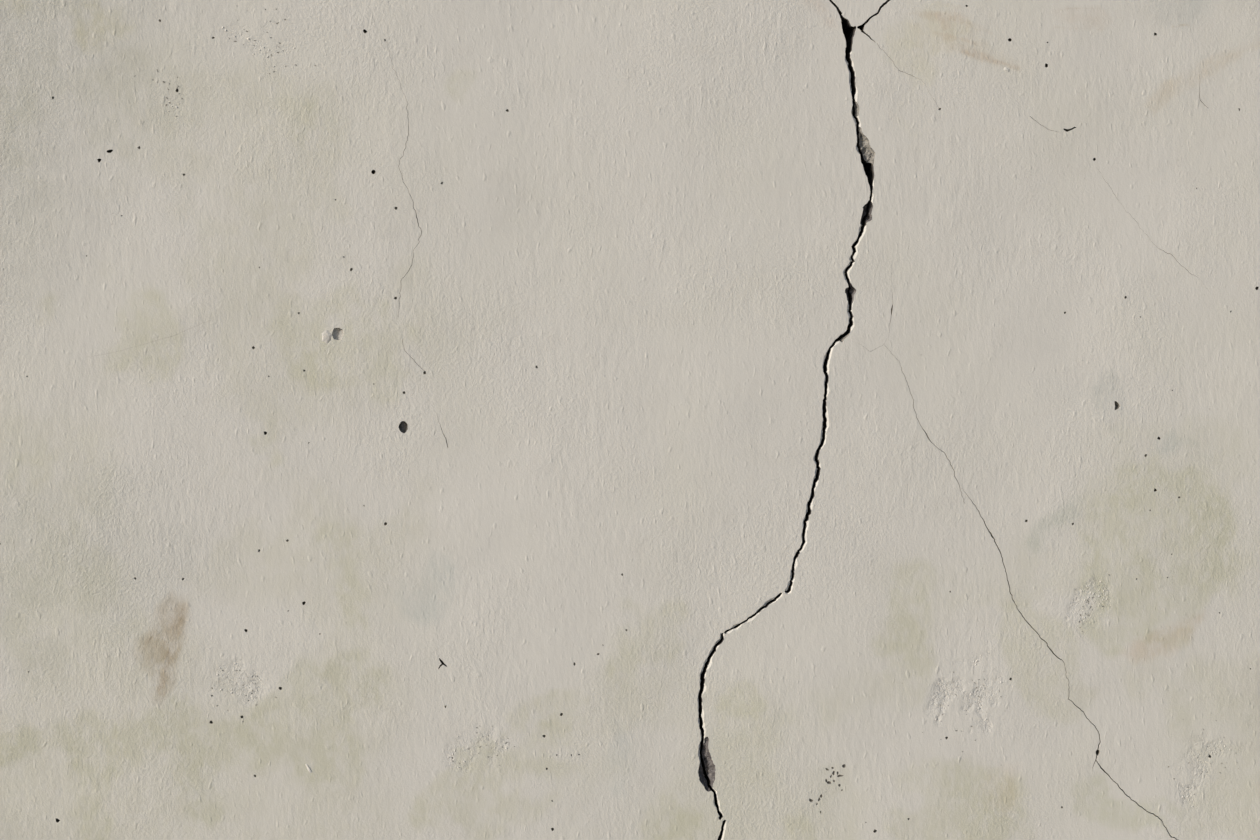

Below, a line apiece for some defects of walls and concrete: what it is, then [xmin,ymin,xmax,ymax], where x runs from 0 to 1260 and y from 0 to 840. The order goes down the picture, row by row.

crack [697,0,1177,840]